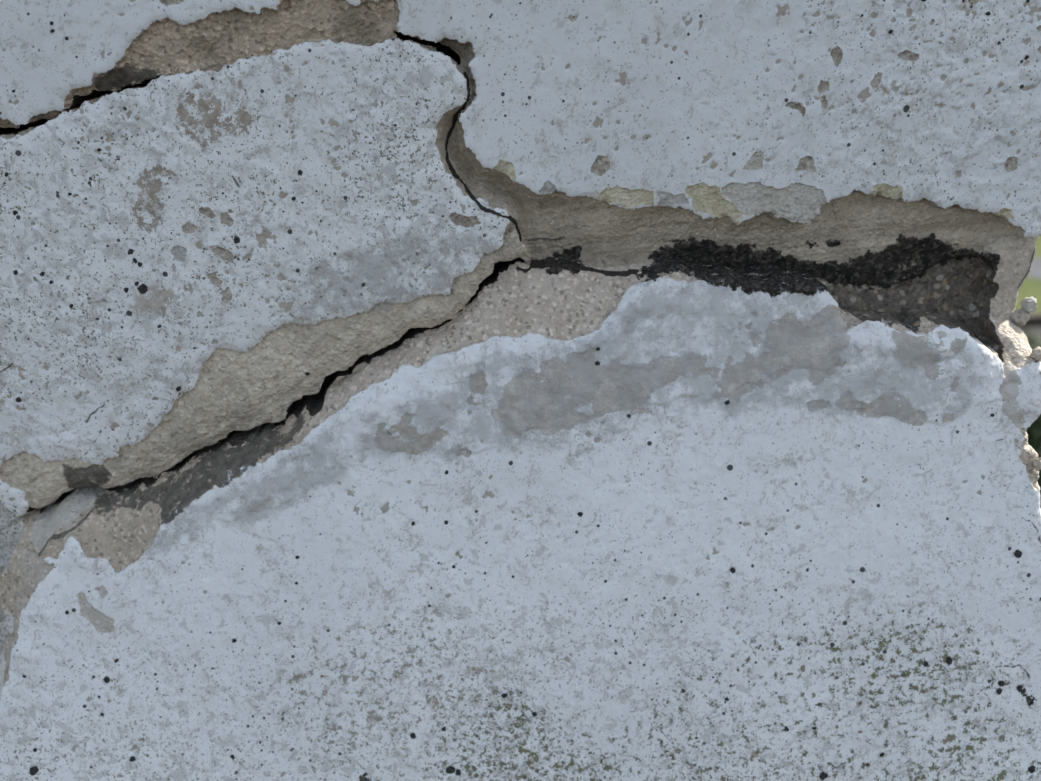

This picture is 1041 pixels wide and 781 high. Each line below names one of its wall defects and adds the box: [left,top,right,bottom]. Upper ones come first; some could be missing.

spalling [0,0,400,139]
crack [0,74,163,135]
peeling [176,83,252,151]
peeling [131,164,181,232]
peeling [199,207,234,227]
crack [26,31,663,556]
water stain [545,246,583,275]
spalling [435,38,1041,491]
water stain [636,233,1001,297]
spalling [0,221,652,685]